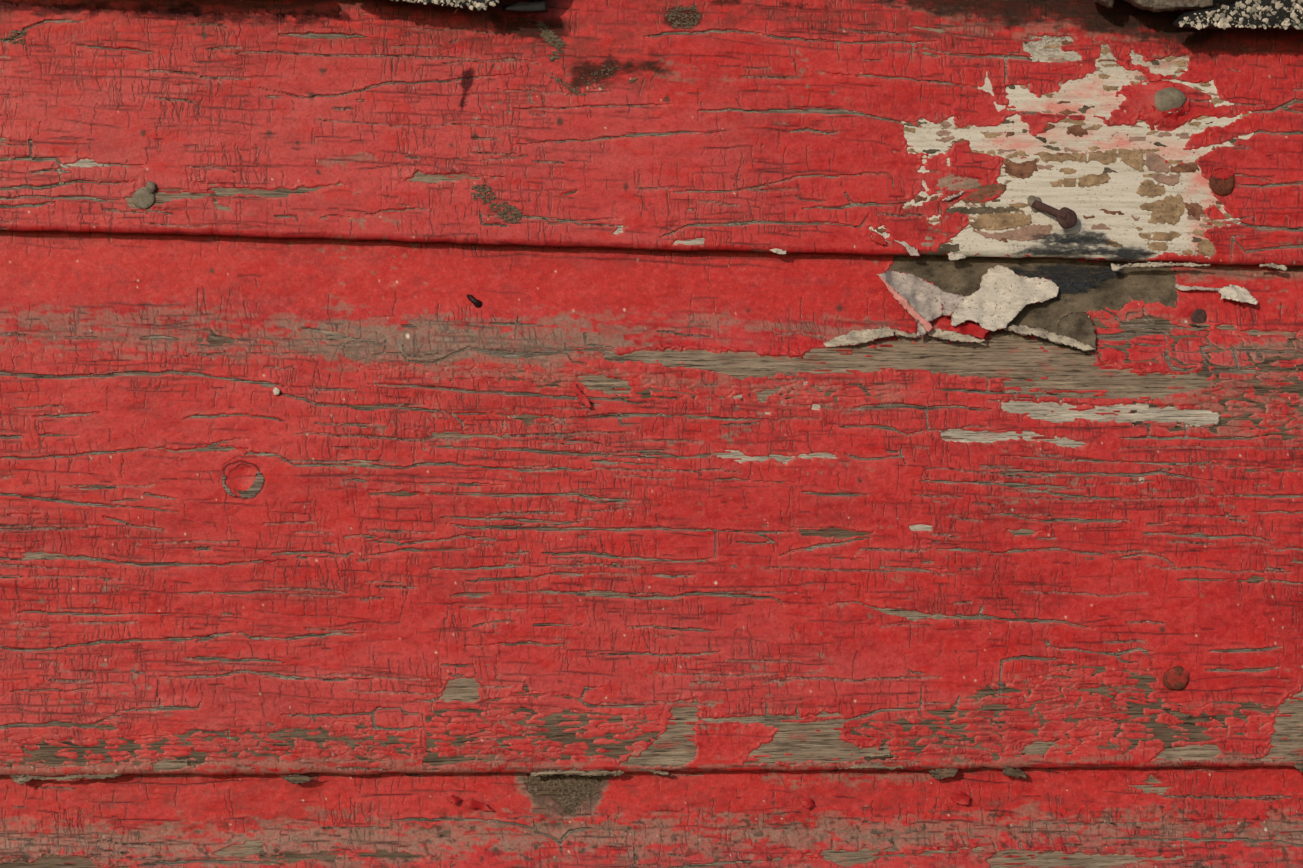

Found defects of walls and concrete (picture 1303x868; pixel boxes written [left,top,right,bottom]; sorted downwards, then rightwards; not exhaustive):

crack [279,31,366,39]
crack [262,75,491,99]
crack [516,104,902,145]
crack [645,29,1040,114]
crack [1252,98,1303,135]
crack [0,139,134,208]
crack [664,172,906,236]
peeling [345,27,1303,454]
crack [1231,223,1303,261]
crack [0,307,1303,739]
peeling [0,664,1303,815]
crack [391,817,592,854]